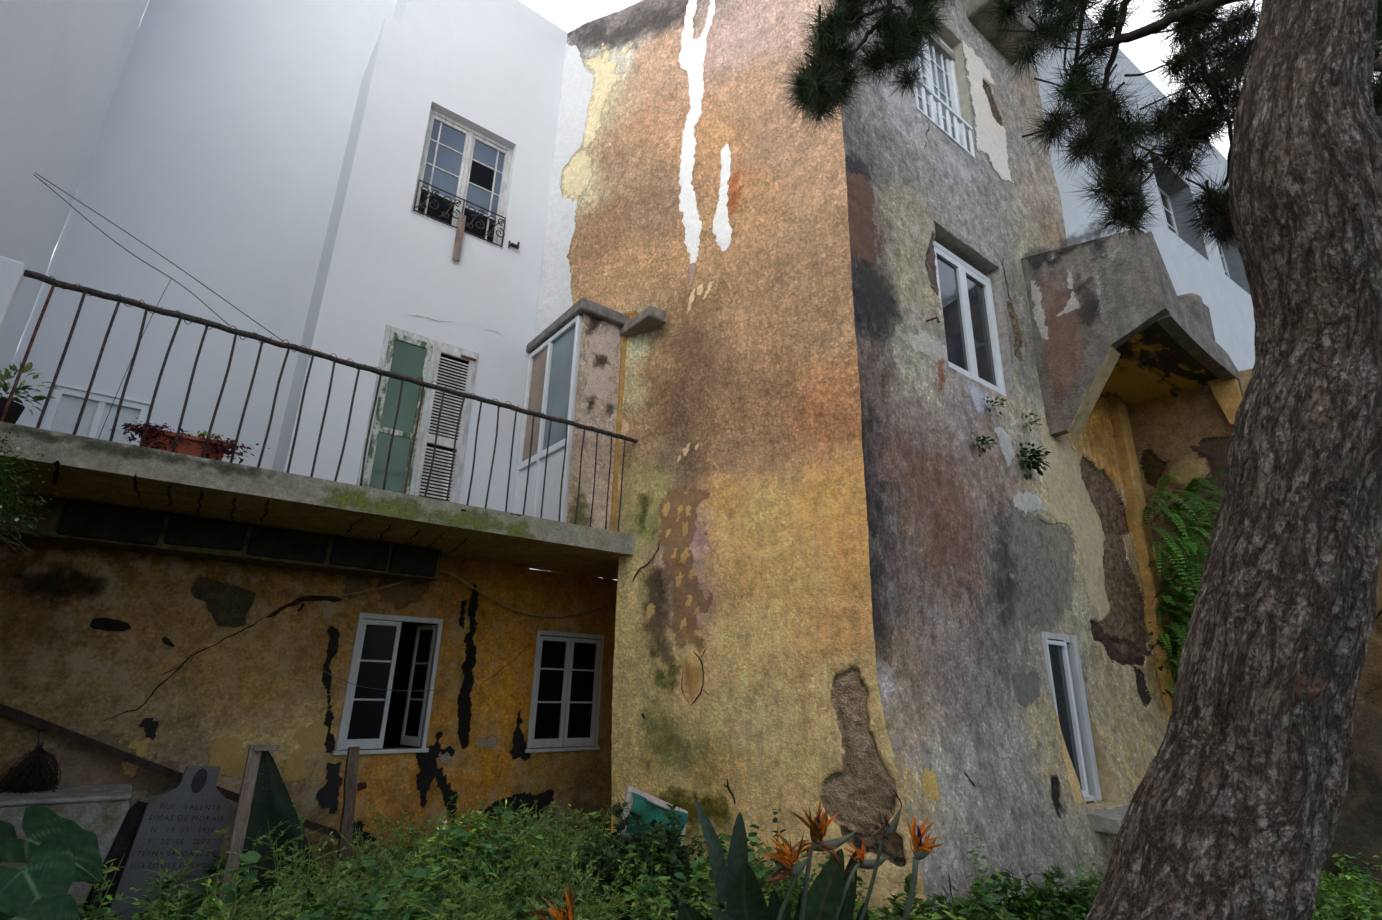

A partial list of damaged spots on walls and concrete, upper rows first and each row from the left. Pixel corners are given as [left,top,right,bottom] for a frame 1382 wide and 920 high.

peeling [561,43,629,198]
peeling [961,40,1014,183]
peeling [994,426,1015,467]
peeling [644,487,713,652]
spalling [1013,413,1152,707]
crack [98,616,266,724]
spalling [821,668,906,866]
peeling [1056,712,1084,805]